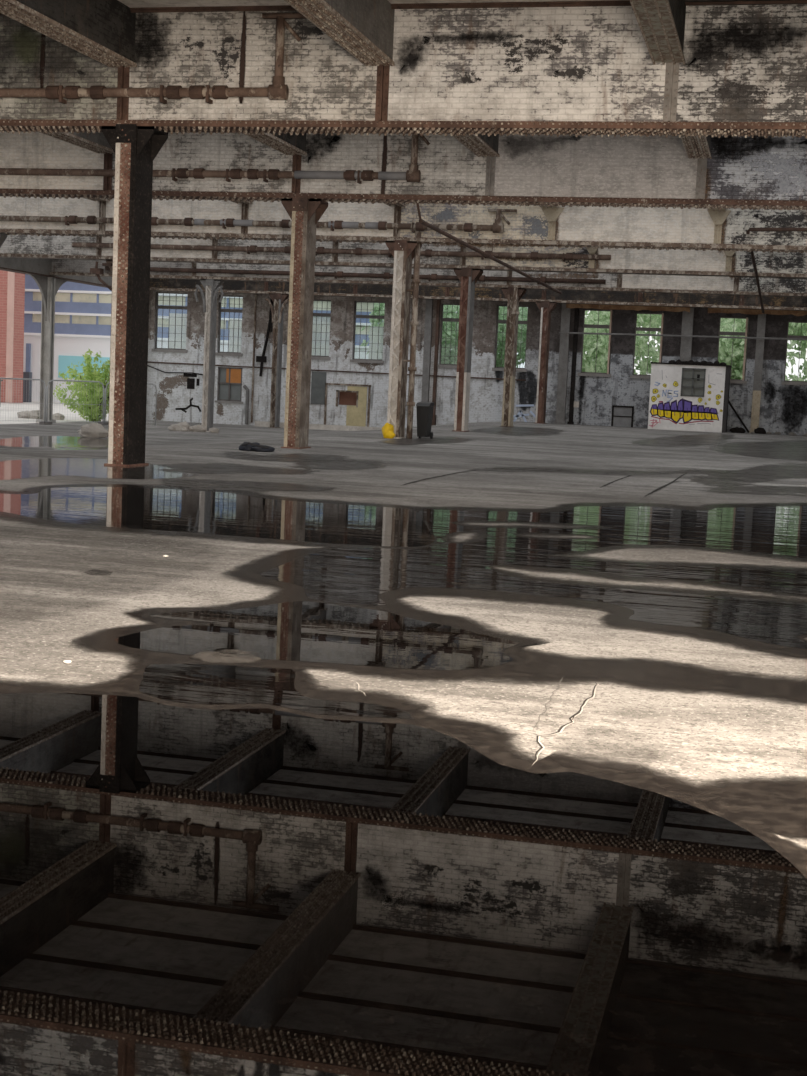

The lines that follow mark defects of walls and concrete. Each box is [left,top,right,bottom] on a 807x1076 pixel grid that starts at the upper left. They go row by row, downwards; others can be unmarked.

spalling [152,374,189,421]
crack [524,676,599,765]